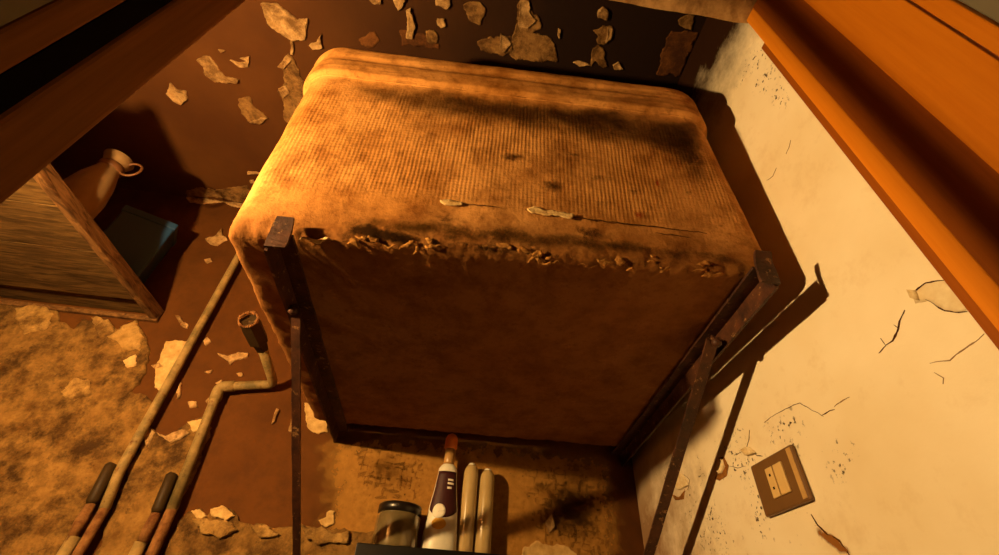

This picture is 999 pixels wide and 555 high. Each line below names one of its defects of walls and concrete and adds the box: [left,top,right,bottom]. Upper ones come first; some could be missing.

peeling [196,49,250,84]
peeling [260,2,323,123]
peeling [393,0,451,49]
peeling [477,0,561,63]
peeling [573,6,623,70]
peeling [166,82,188,105]
peeling [238,96,269,125]
peeling [907,280,967,313]
crack [879,310,905,353]
crack [932,334,984,384]
spalling [0,304,374,555]
crack [737,397,849,456]